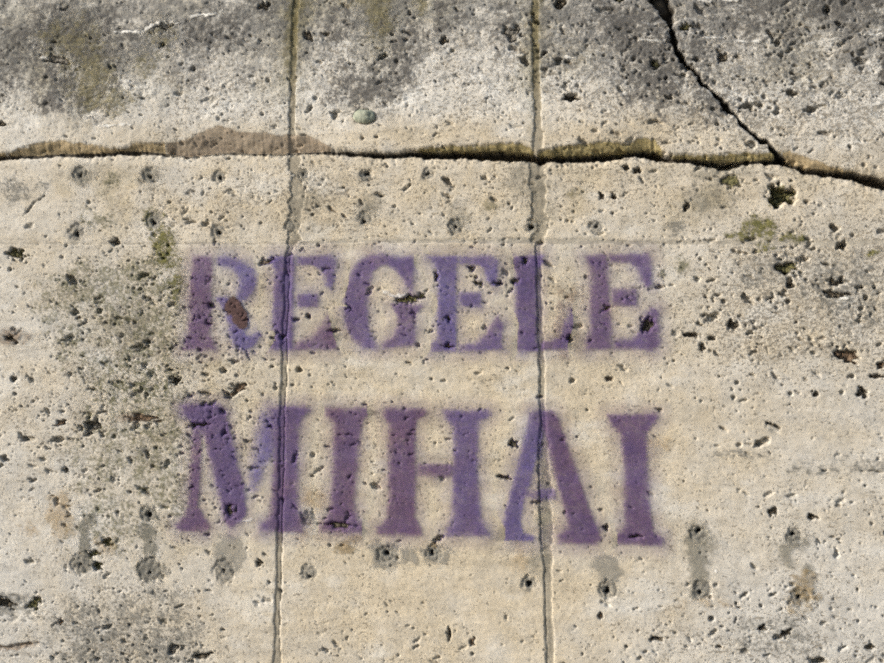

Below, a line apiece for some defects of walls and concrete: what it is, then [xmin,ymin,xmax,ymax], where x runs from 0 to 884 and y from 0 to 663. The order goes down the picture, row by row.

crack [0,151,189,161]
crack [210,0,884,190]